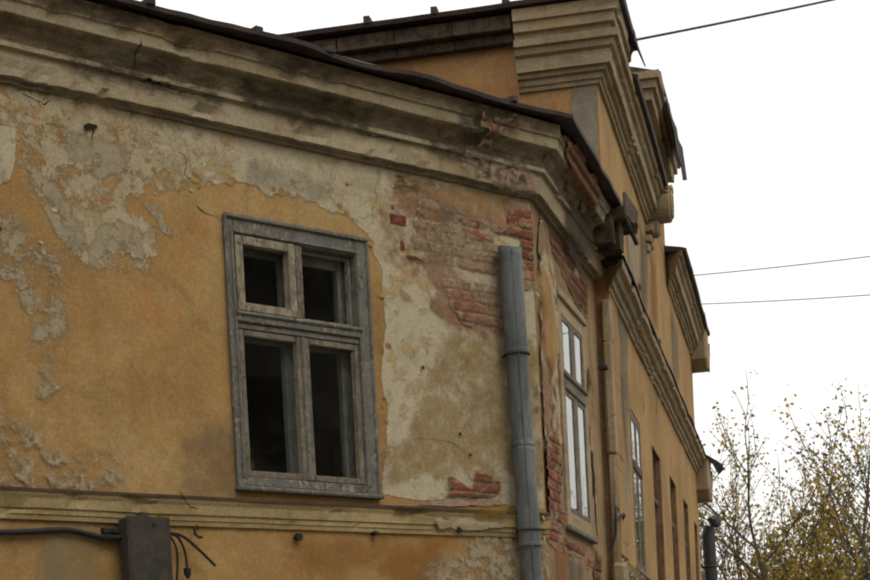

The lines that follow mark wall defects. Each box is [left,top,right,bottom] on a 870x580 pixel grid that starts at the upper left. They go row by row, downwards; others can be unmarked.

water stain [70,44,225,106]
crack [133,38,207,98]
water stain [242,74,372,134]
flaking render [0,84,602,580]